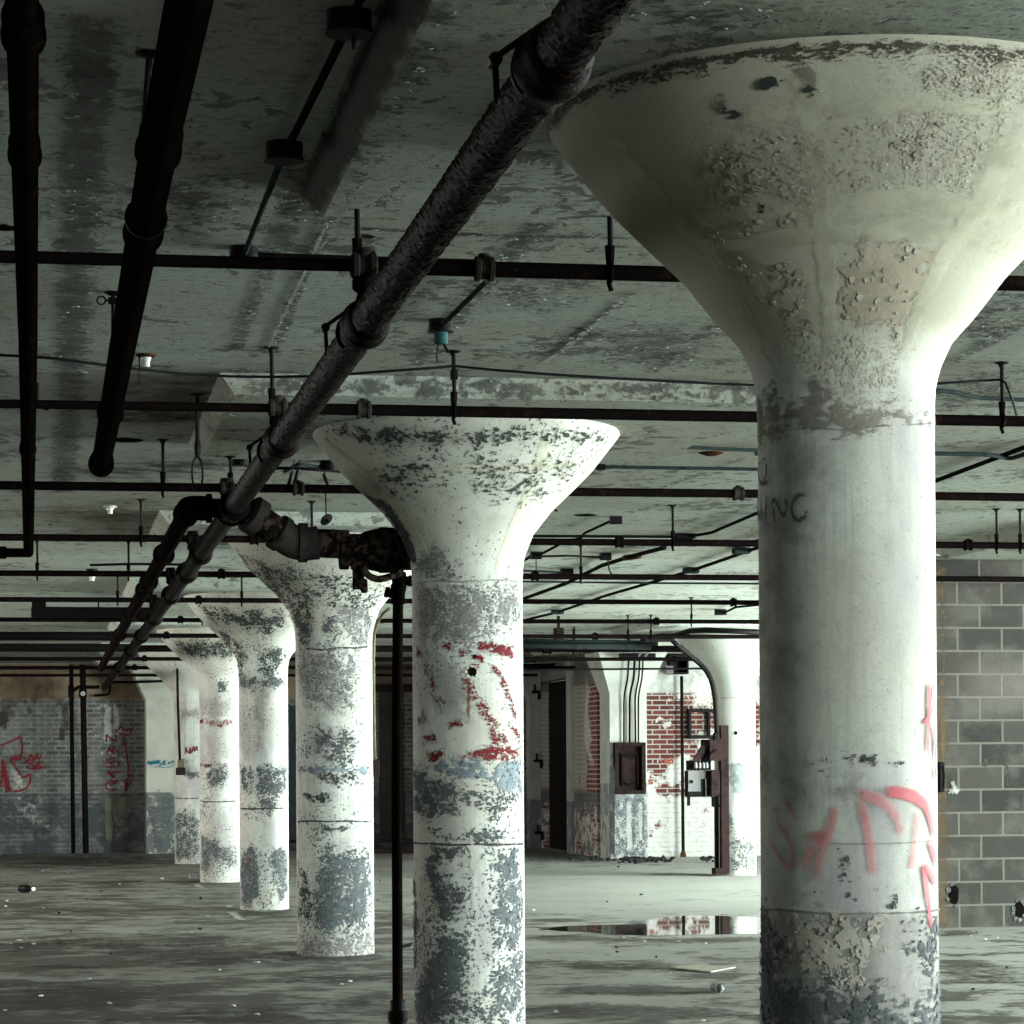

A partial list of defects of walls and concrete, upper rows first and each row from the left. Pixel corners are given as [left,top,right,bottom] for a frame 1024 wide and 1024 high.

spalling [753,75,783,91]
peeling [717,247,819,336]
peeling [833,234,940,342]
peeling [319,420,626,723]
peeling [171,548,384,819]
peeling [609,766,653,858]
peeling [412,753,525,1024]
peeling [759,882,959,1024]
spalling [1012,899,1024,922]